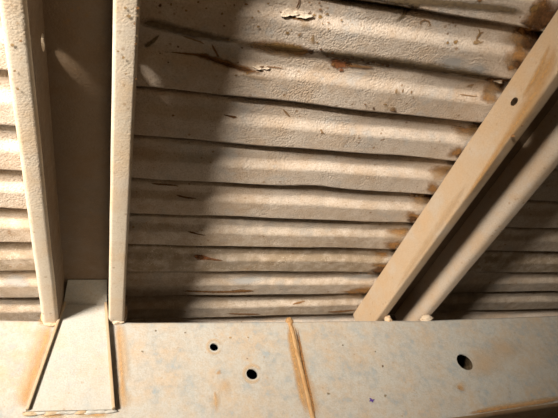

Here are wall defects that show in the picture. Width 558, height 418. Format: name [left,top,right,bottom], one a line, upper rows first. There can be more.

peeling [280,0,314,21]
rust [508,0,558,70]
rust [331,59,373,71]
rust [473,50,552,187]
rust [413,184,437,203]
rust [376,229,407,257]
rust [289,332,315,413]